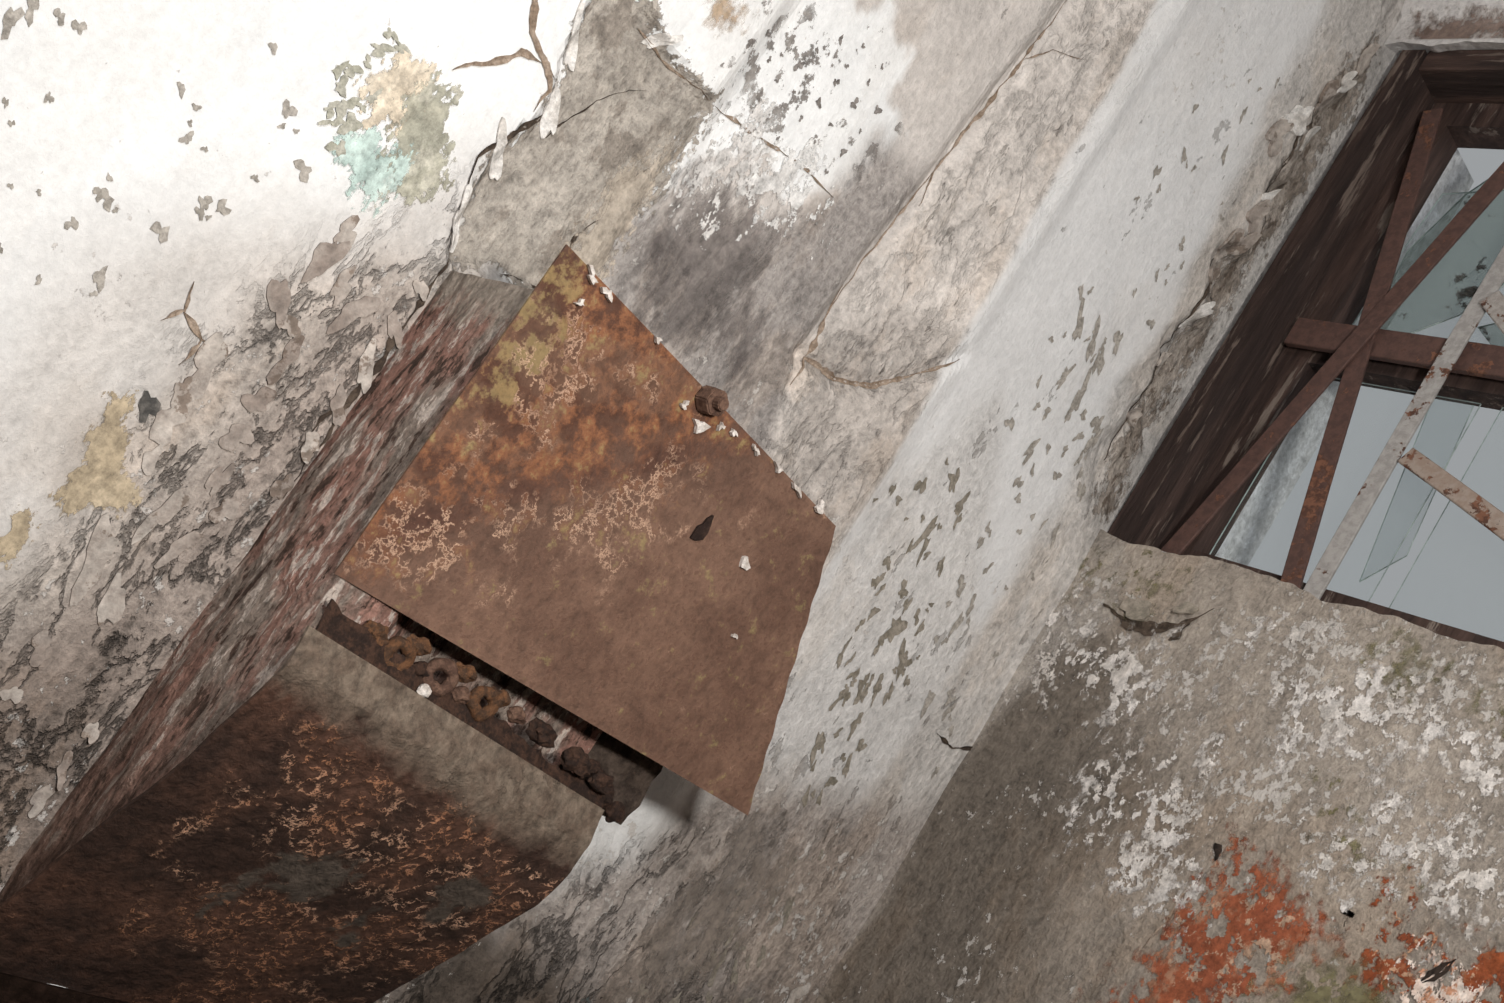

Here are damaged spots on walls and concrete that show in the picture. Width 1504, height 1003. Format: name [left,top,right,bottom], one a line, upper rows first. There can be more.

peeling [1,0,87,40]
peeling [93,173,119,213]
peeling [64,217,79,230]
peeling [89,266,108,296]
flaking render [150,0,834,569]
water stain [635,186,779,378]
peeling [48,332,228,625]
peeling [0,508,41,570]
peeling [29,629,52,667]
peeling [0,686,24,704]
peeling [28,722,99,818]